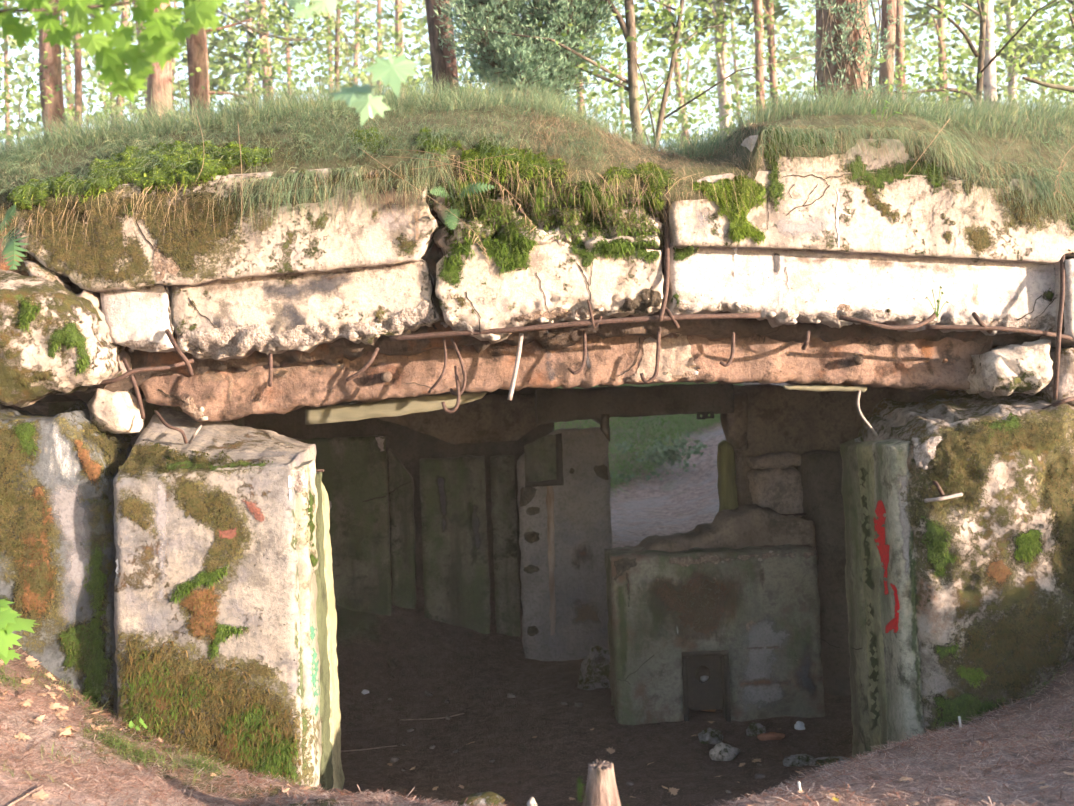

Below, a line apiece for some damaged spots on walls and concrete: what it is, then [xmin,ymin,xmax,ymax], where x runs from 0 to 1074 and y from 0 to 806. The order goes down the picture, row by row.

crack [767,173,852,247]
crack [134,215,217,354]
corrosion [367,365,404,386]
crack [415,225,438,332]
spalling [93,208,1074,444]